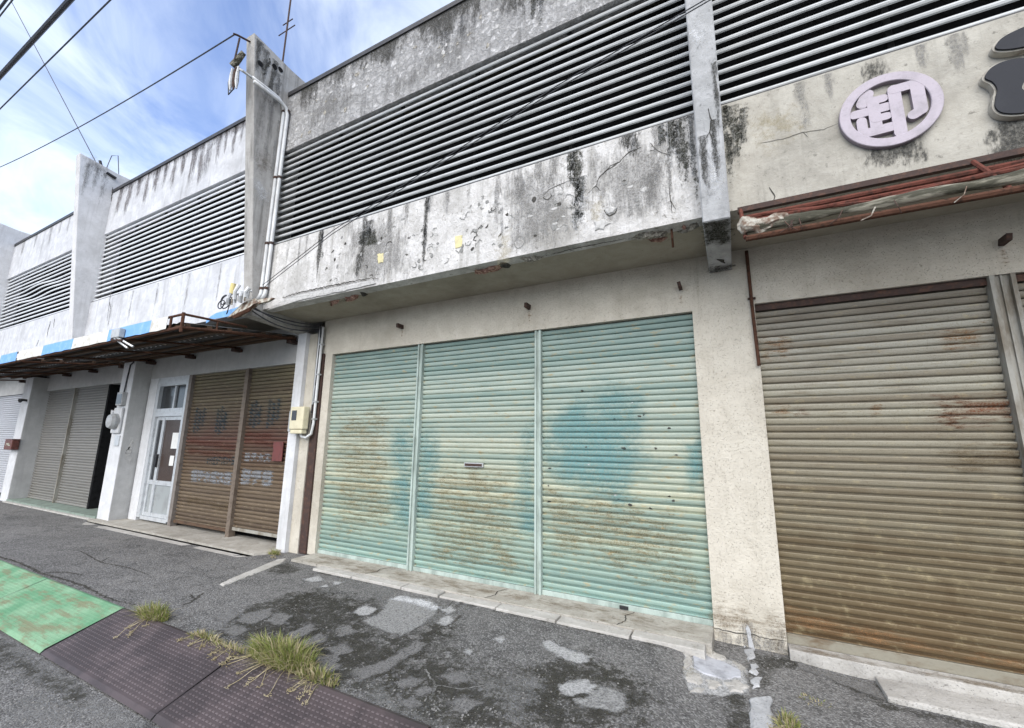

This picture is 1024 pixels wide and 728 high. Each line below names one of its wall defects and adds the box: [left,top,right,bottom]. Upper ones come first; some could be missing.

leakage [352,209,400,280]
leakage [495,150,594,246]
crack [546,143,669,194]
leakage [598,61,748,217]
leakage [865,141,927,166]
rust [935,395,1011,427]
rust [433,468,518,575]
rust [544,491,696,593]